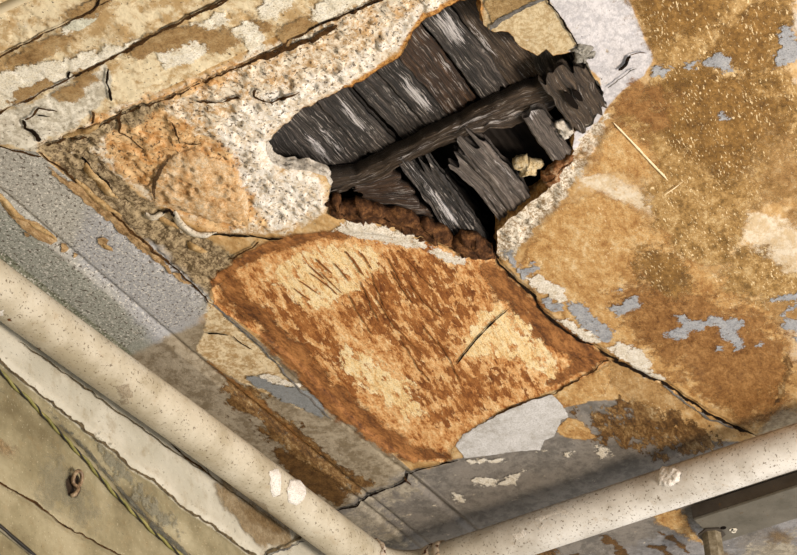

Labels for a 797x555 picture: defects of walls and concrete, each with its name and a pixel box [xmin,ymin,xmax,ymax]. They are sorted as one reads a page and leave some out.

peeling [190,0,293,55]
peeling [309,0,368,27]
spalling [266,140,349,200]
crack [0,0,383,419]
leakage [520,0,797,463]
corrosion [210,230,612,463]
crack [456,310,507,365]
crack [486,243,756,436]
crack [0,342,305,555]
peeling [456,394,568,465]
leakage [599,535,629,555]
leakage [647,509,703,555]